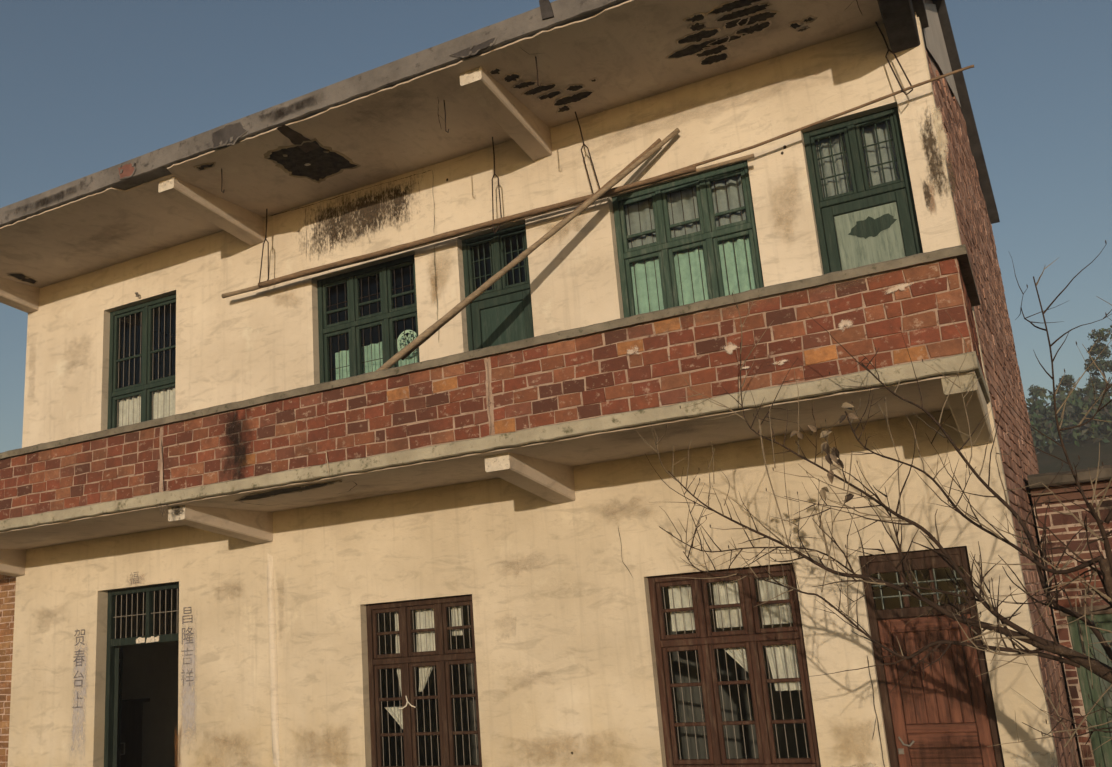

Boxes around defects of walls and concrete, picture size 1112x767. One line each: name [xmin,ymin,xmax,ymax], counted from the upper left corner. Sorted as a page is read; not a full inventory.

spalling [665,0,779,66]
spalling [788,15,817,33]
spalling [488,67,598,113]
spalling [264,125,361,183]
water stain [304,183,412,253]
spalling [235,479,343,506]